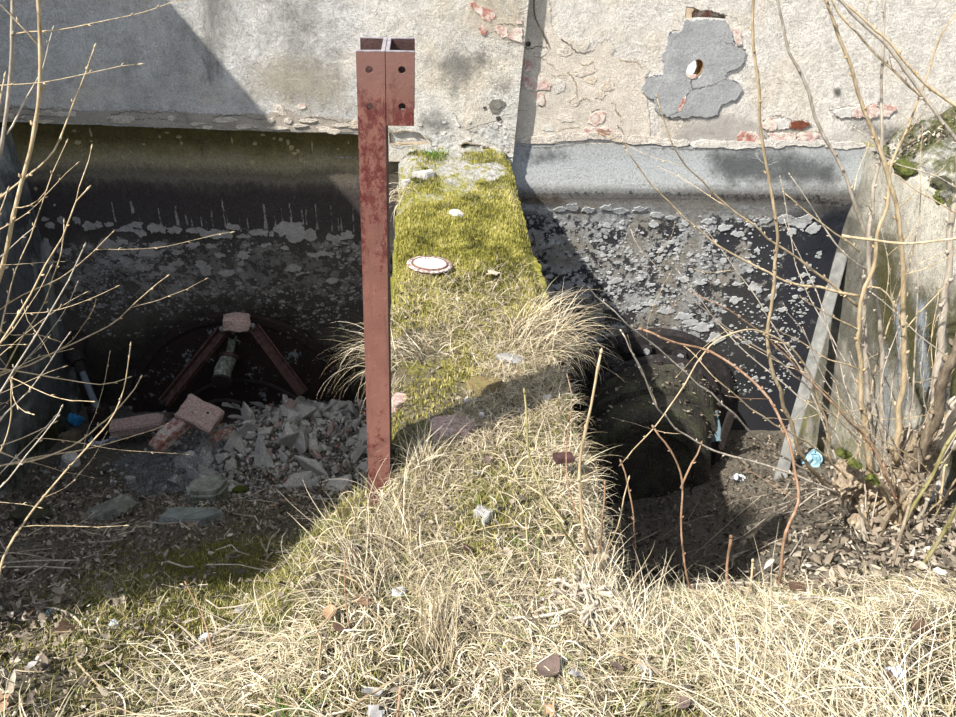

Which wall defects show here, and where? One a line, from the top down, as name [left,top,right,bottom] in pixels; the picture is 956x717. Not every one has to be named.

peeling [464,0,866,150]
flaking render [829,104,897,119]
peeling [41,204,363,337]
leakage [262,203,354,232]
peeling [522,203,822,392]